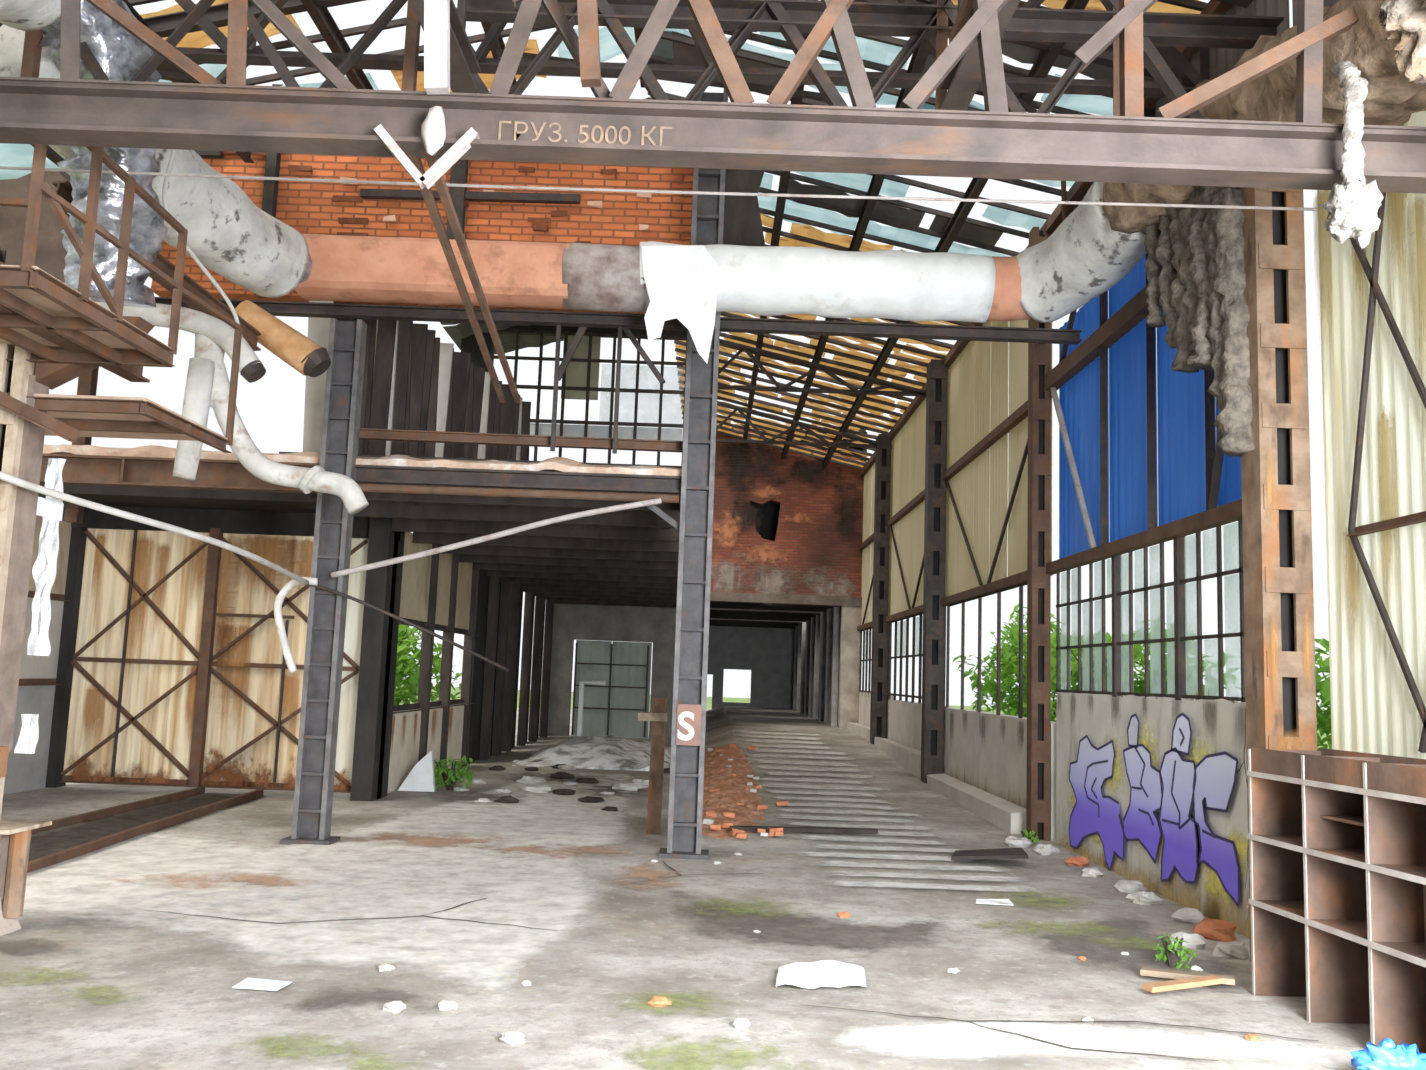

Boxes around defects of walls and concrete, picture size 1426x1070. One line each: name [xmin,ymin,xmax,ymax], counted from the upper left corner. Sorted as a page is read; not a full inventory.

leakage [1314,190,1332,320]
leakage [1355,248,1365,289]
leakage [1388,192,1426,371]
spalling [754,486,780,498]
leakage [1379,413,1396,576]
rust [131,539,168,625]
rust [192,537,314,702]
peeling [711,513,856,604]
leakage [1345,531,1359,623]
rust [84,689,104,729]
rust [186,666,198,722]
rust [71,750,295,788]